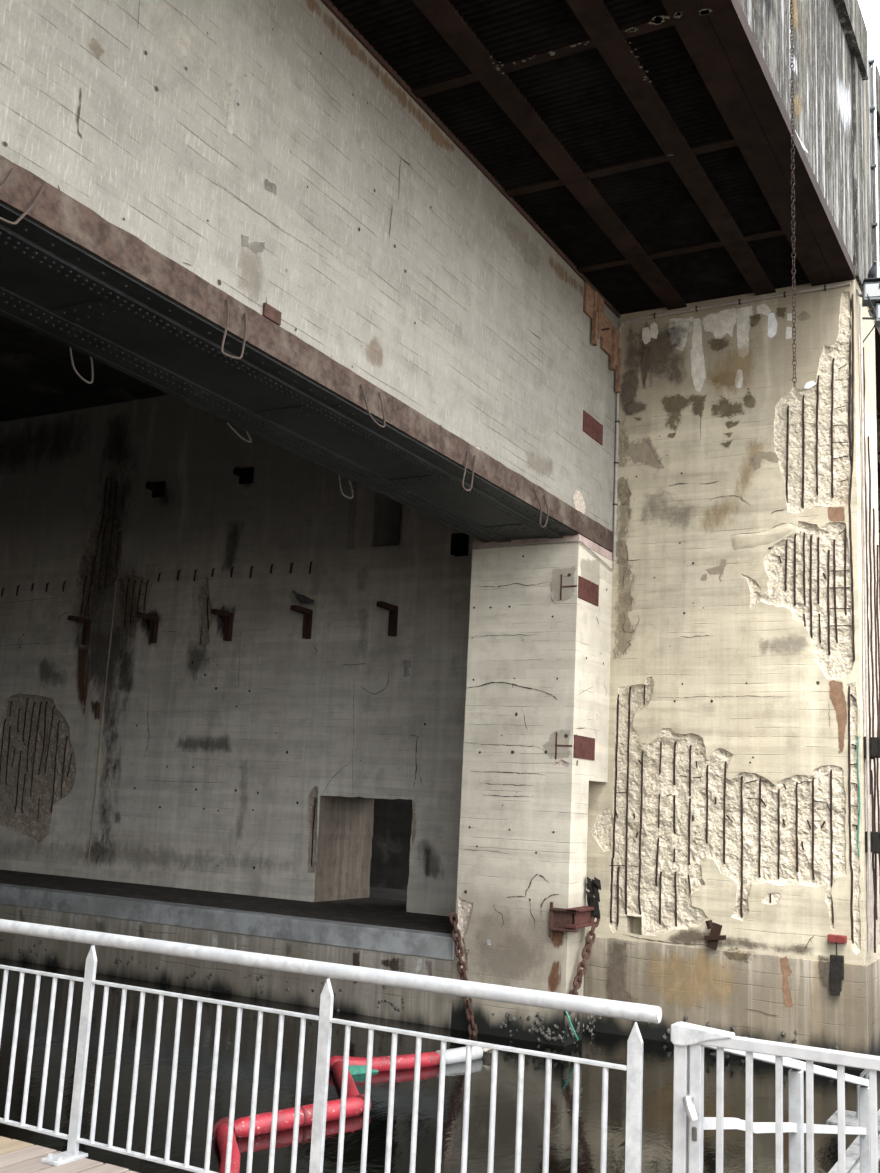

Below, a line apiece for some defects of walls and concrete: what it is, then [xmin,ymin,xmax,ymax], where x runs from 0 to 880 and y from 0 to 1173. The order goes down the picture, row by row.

leakage [615,304,792,657]
spalling [0,693,76,843]
leakage [78,481,135,689]
spalling [591,292,880,955]
rust [829,680,847,753]
rust [780,956,793,1007]